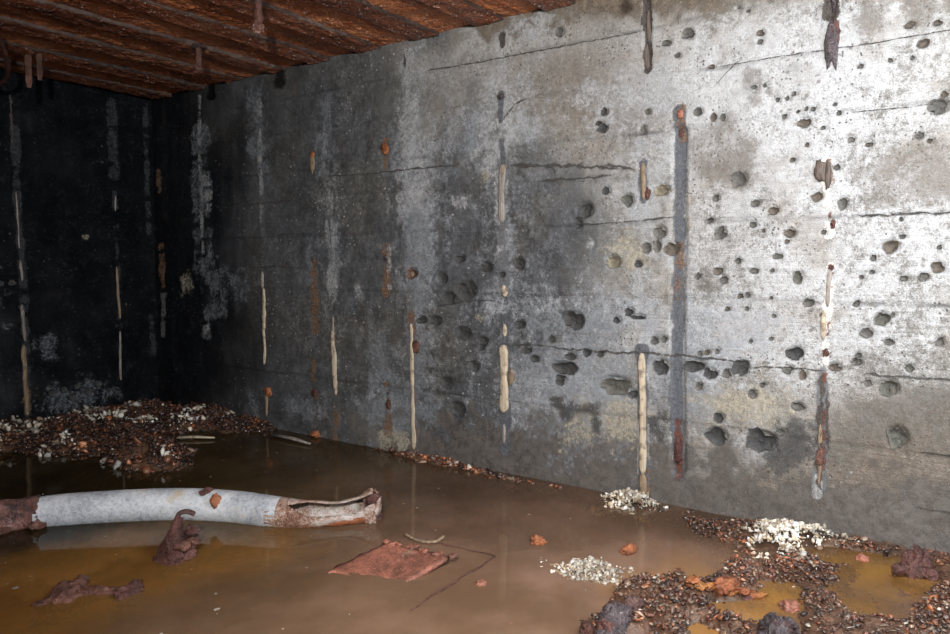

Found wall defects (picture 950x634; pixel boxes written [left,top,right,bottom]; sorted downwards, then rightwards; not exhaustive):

crack [715,30,949,86]
water stain [107,99,120,180]
water stain [397,94,433,212]
water stain [471,56,531,223]
crack [510,162,634,182]
water stain [33,334,57,360]
crack [515,343,825,372]
water stain [35,379,122,414]
rust [673,419,684,480]
rust [811,368,830,498]